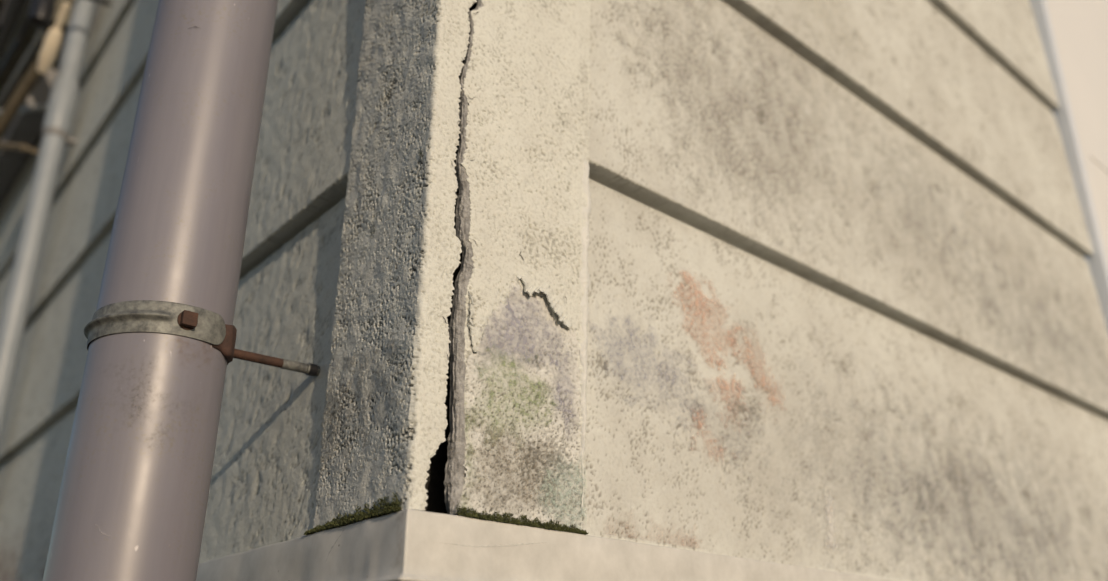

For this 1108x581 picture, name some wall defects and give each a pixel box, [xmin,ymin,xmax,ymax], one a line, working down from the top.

crack [425,0,483,515]
leakage [472,431,553,507]
peeling [457,274,585,530]